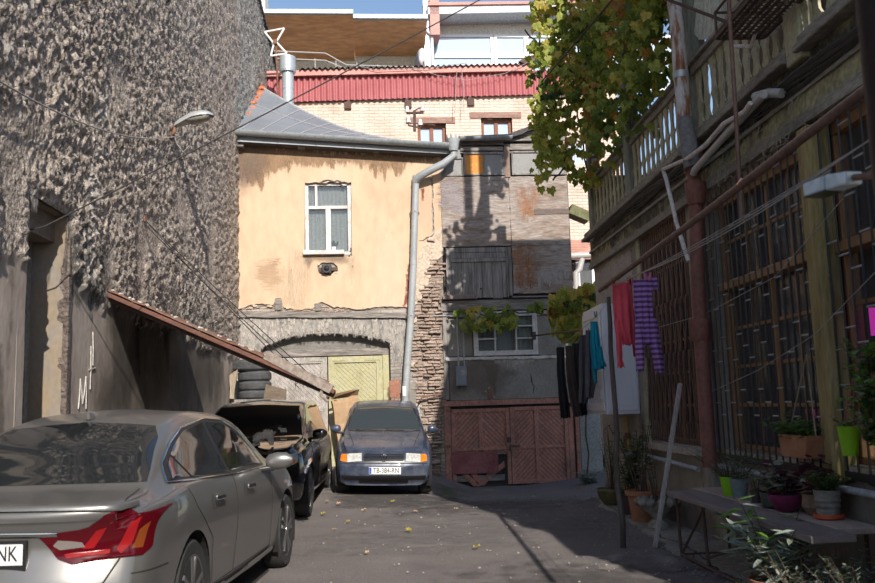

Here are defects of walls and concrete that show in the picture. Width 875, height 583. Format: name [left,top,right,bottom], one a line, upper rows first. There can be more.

damp [239,146,434,190]
spalling [57,238,72,415]